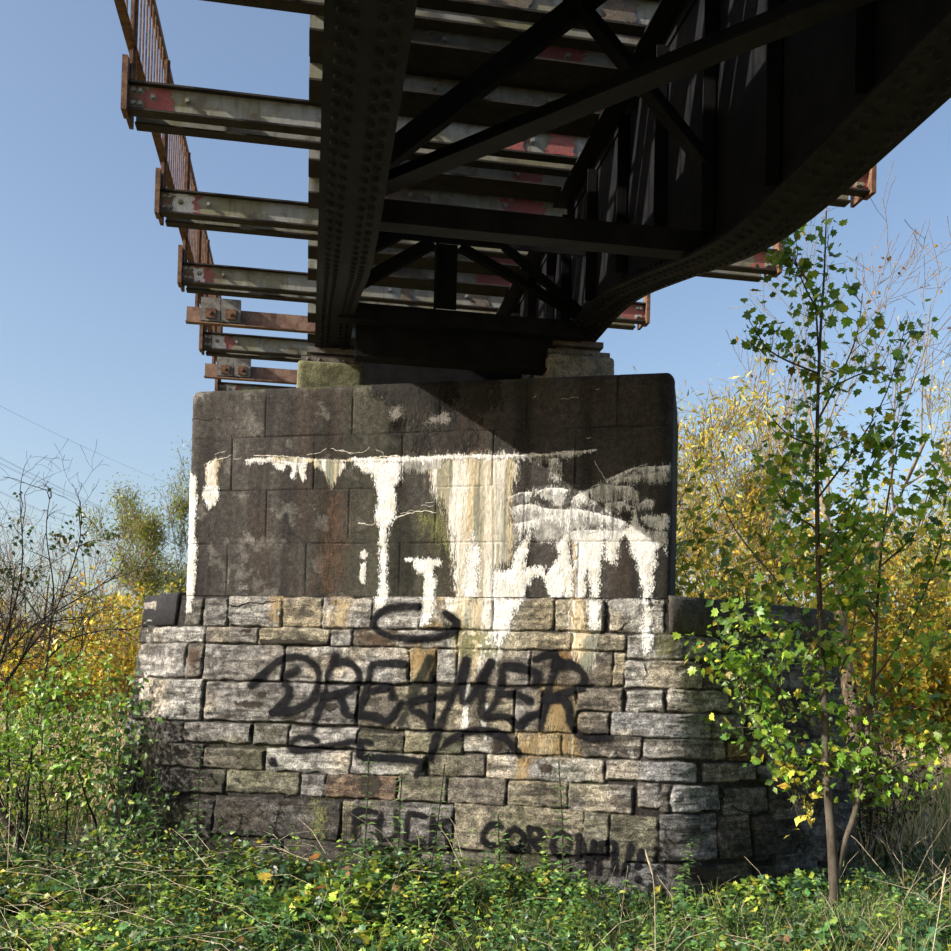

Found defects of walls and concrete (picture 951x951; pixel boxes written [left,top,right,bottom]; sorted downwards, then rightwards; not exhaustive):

peeling [160,192,197,213]
damp [186,459,221,614]
damp [246,379,681,742]